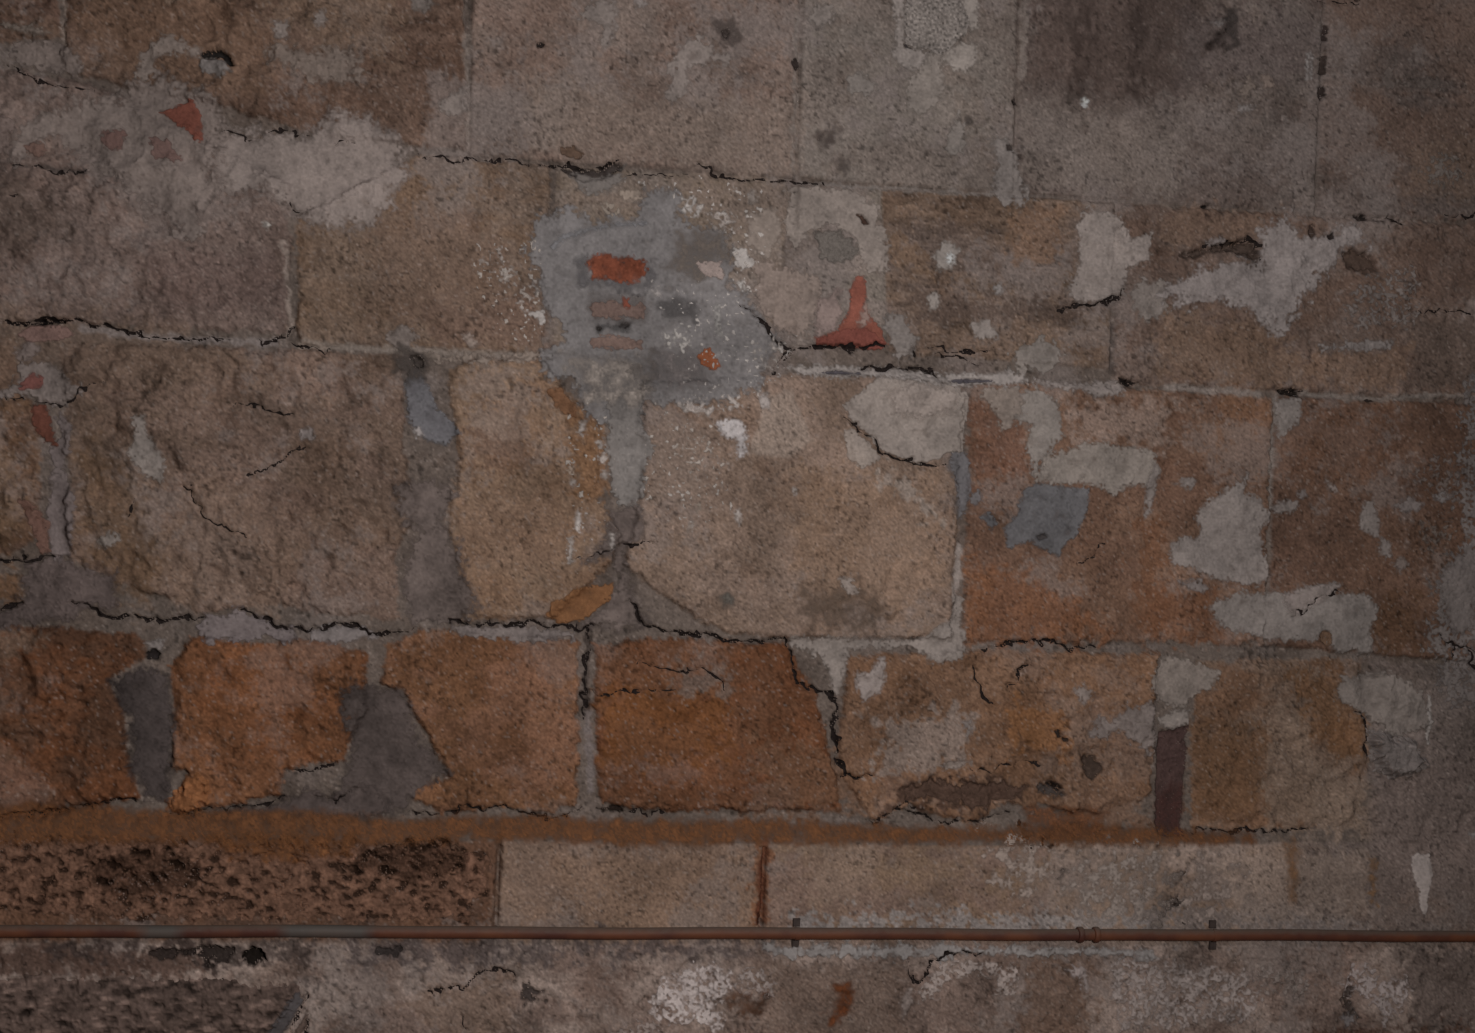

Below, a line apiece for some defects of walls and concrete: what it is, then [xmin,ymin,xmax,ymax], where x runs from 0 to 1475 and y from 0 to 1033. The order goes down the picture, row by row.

crack [418,153,545,167]
crack [627,163,825,186]
flaking render [696,261,724,280]
flaking render [587,253,649,351]
crack [1057,288,1125,314]
flaking render [697,348,720,370]
peeling [971,320,1070,430]
crack [71,601,206,625]
crack [240,607,414,637]
peeling [1283,583,1340,614]
crack [448,602,873,780]
corrosion [0,801,1254,924]